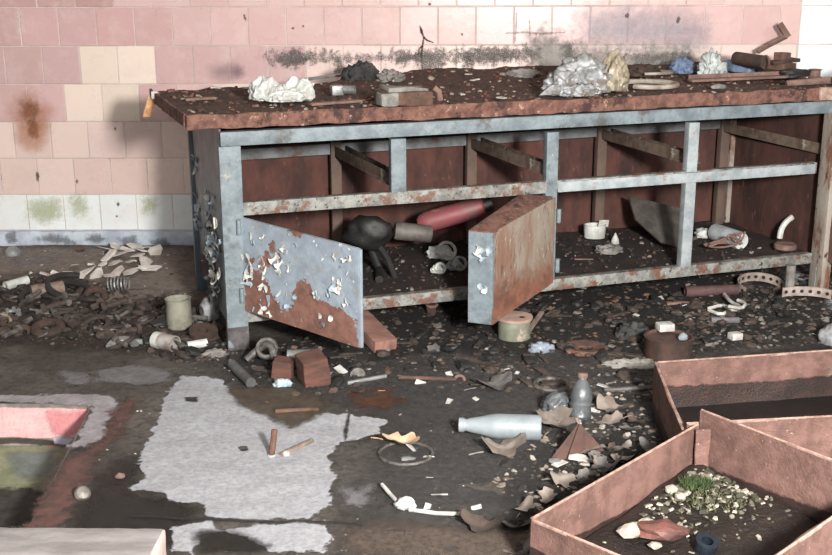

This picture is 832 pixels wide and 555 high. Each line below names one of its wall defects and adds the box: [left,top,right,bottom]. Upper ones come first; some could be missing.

damp [265,33,611,74]
damp [621,46,691,65]
corrosion [21,103,42,144]